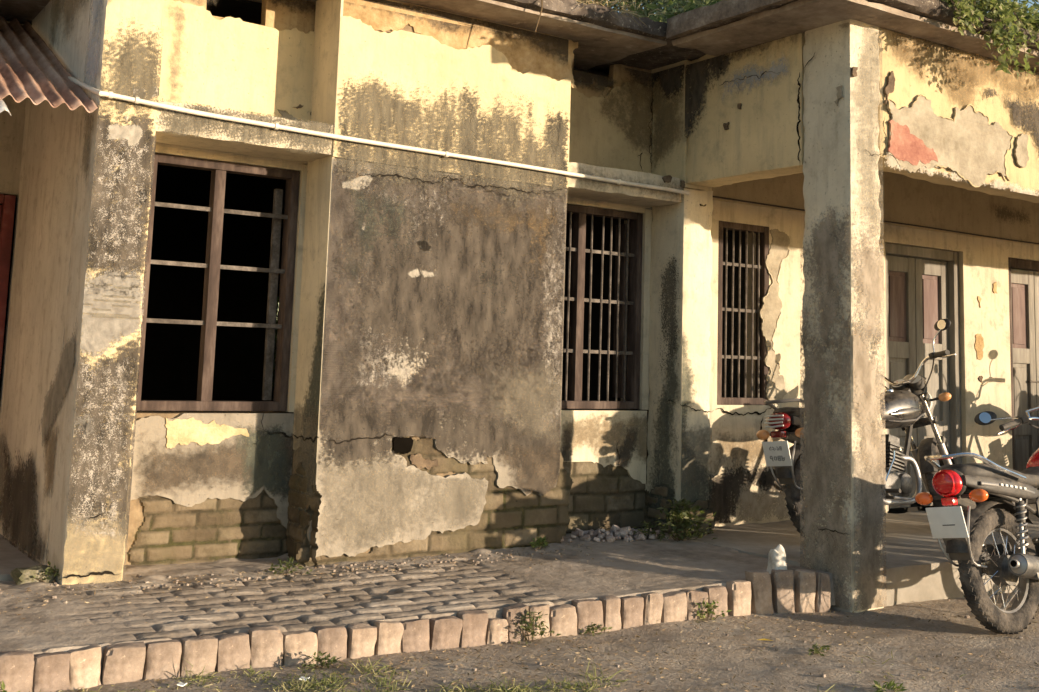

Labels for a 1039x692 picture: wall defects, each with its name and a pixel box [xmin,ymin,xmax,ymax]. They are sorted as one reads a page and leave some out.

leakage [82,20,177,278]
crack [338,171,562,197]
flaking render [343,0,578,89]
leakage [572,69,679,158]
leakage [894,32,1039,156]
peeling [66,116,153,539]
flaking render [165,417,249,449]
leakage [0,71,647,584]
crack [261,413,394,444]
leakage [658,256,711,522]
peeling [759,229,790,400]
flaking render [128,436,715,569]